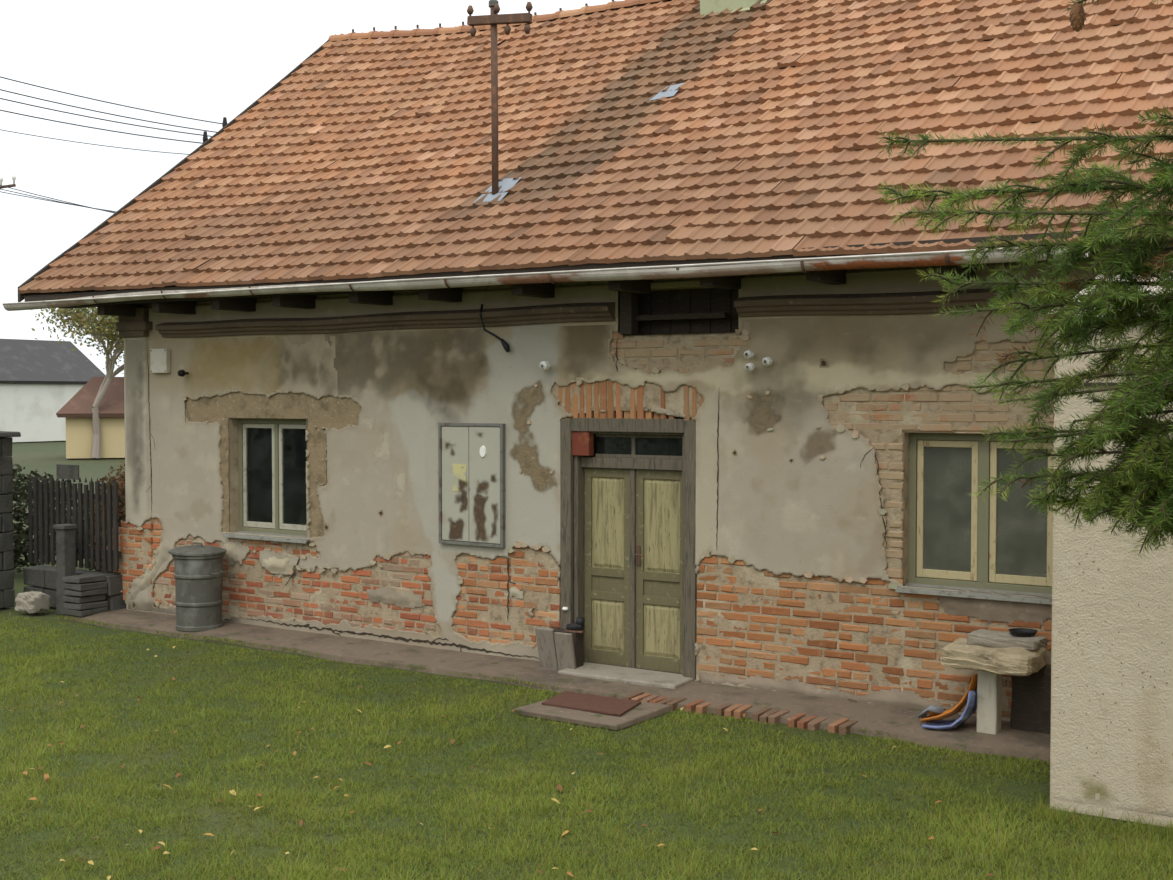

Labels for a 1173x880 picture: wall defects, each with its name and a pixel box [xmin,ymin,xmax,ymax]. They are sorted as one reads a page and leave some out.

spalling [511,329,750,491]
flaking render [107,518,561,649]
crack [860,446,887,546]
flaking render [696,340,1083,719]